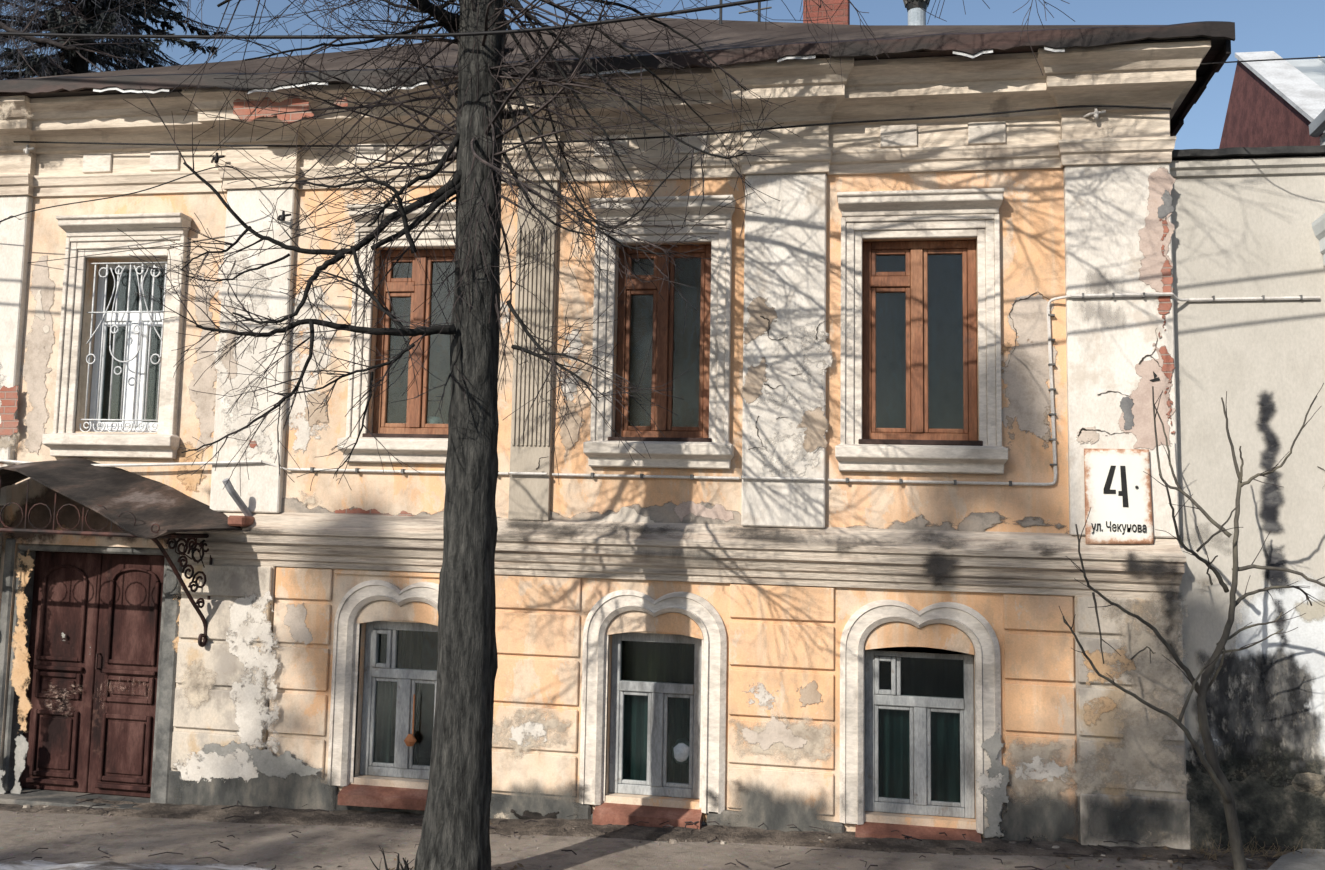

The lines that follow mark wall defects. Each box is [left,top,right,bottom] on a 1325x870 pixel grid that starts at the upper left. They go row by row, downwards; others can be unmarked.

peeling [0,255,55,455]
peeling [741,296,833,481]
peeling [1076,167,1176,450]
spalling [282,492,444,517]
spalling [550,501,741,525]
spalling [847,512,1067,534]
leakage [1188,393,1325,787]
peeling [173,591,313,783]
peeling [492,709,571,757]
peeling [733,680,833,761]
peeling [976,598,1189,799]